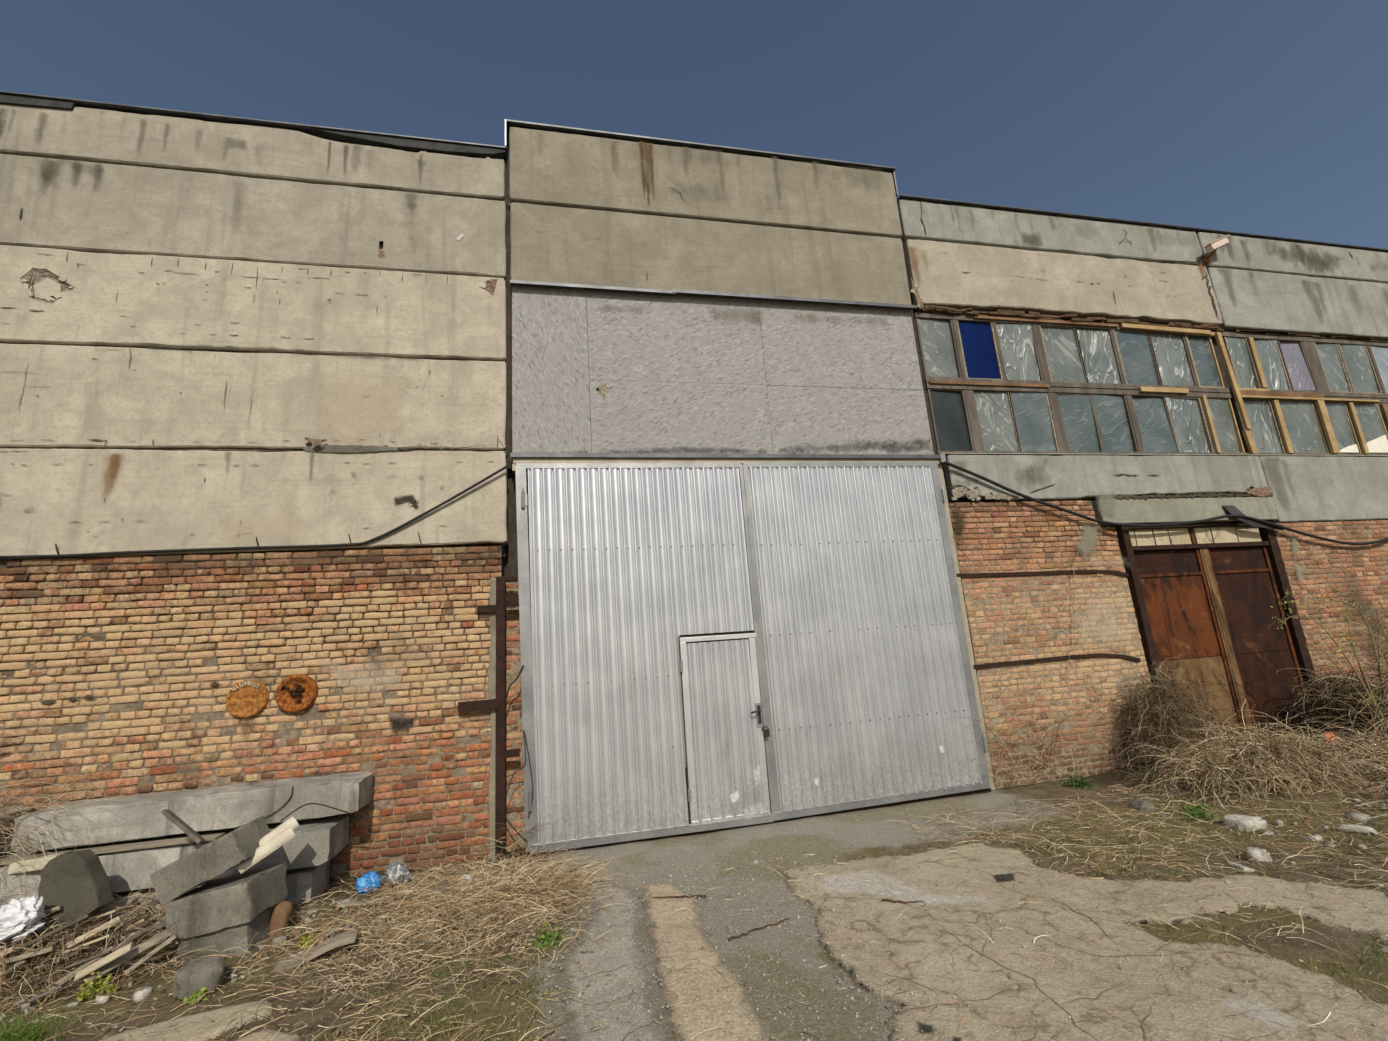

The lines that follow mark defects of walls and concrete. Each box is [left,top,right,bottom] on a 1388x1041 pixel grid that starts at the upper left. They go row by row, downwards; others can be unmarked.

spalling [19,251,78,311]
rust [107,454,119,485]